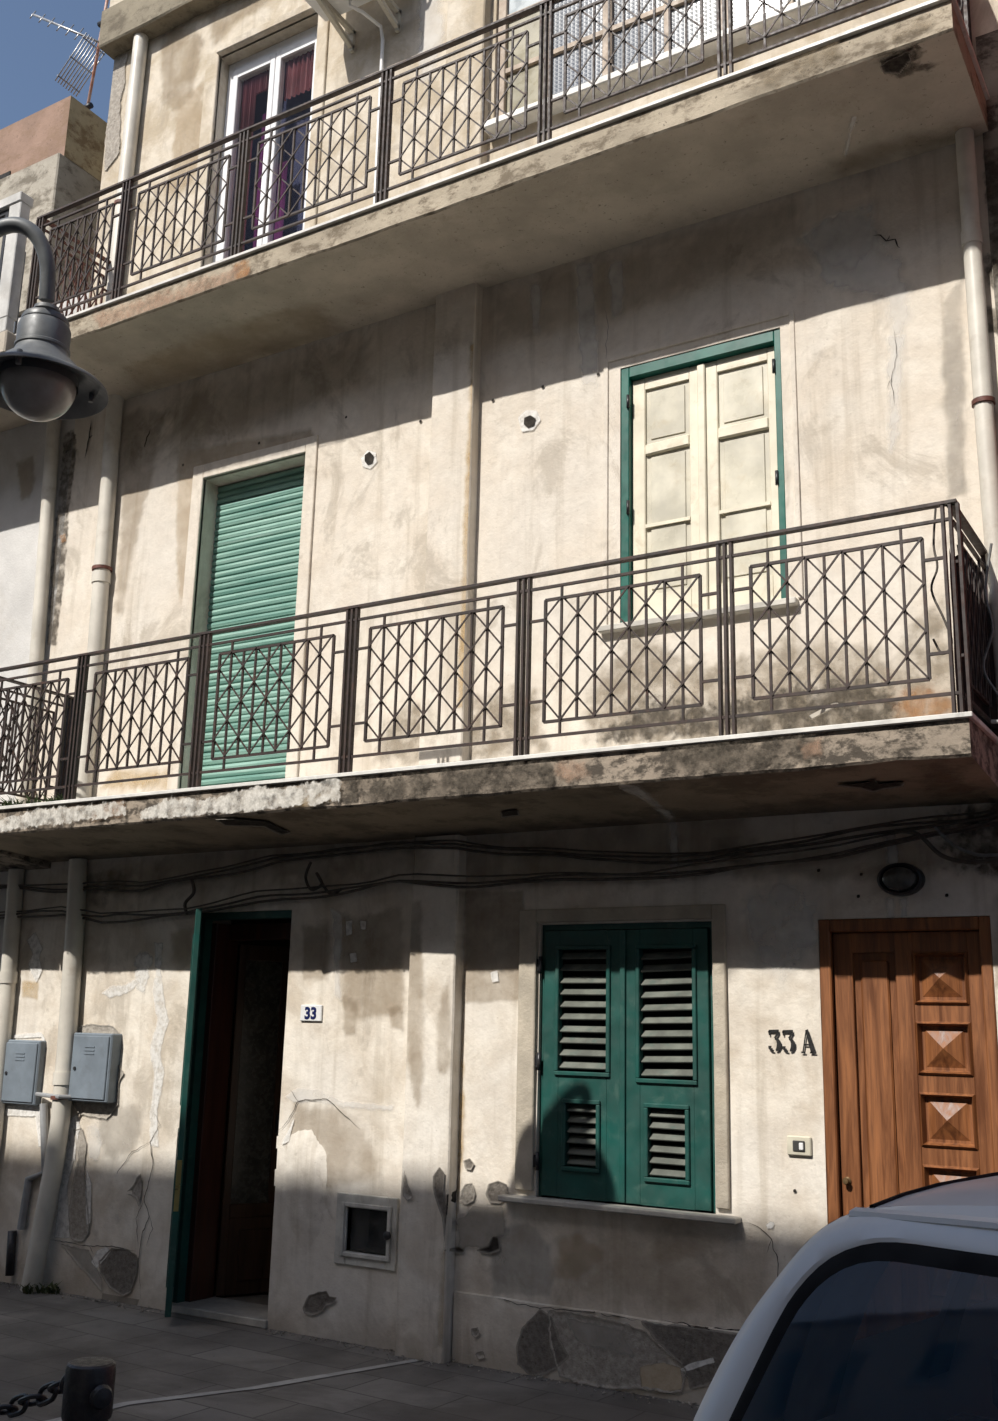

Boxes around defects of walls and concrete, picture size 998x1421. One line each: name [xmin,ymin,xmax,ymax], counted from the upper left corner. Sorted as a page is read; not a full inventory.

water stain [984,150,998,288]
water stain [987,309,998,332]
water stain [48,432,76,645]
water stain [604,683,949,772]
water stain [0,761,554,832]
crack [284,1092,355,1125]
spalling [55,1115,137,1296]
spalling [433,1159,508,1254]
spalling [303,1291,336,1315]
spalling [516,1309,738,1393]